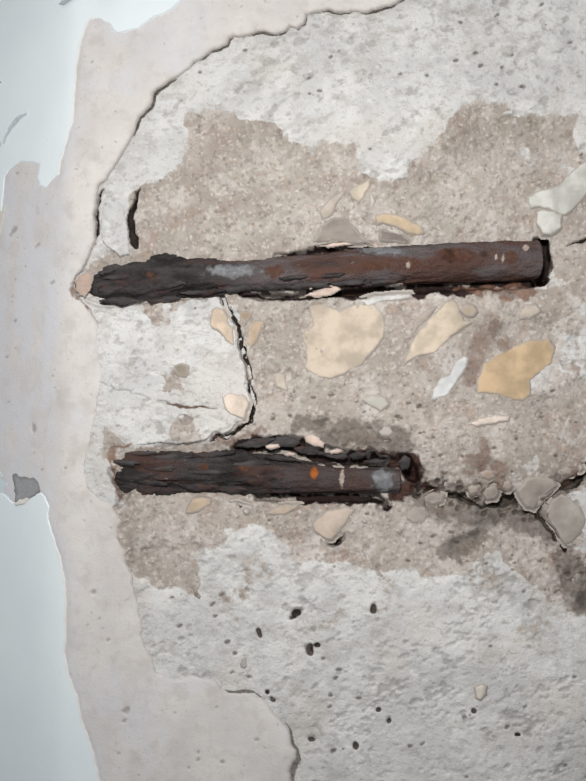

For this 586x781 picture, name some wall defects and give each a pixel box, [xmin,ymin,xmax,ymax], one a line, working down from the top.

spalling [75,0,586,282]
crack [96,189,104,237]
crack [127,188,141,249]
rust [281,246,343,257]
rust [238,285,395,301]
rust [405,238,551,301]
peeling [0,0,411,781]
crack [211,298,257,442]
spalling [75,197,586,781]
rust [231,434,438,511]
crack [414,473,586,552]
crack [285,722,301,781]